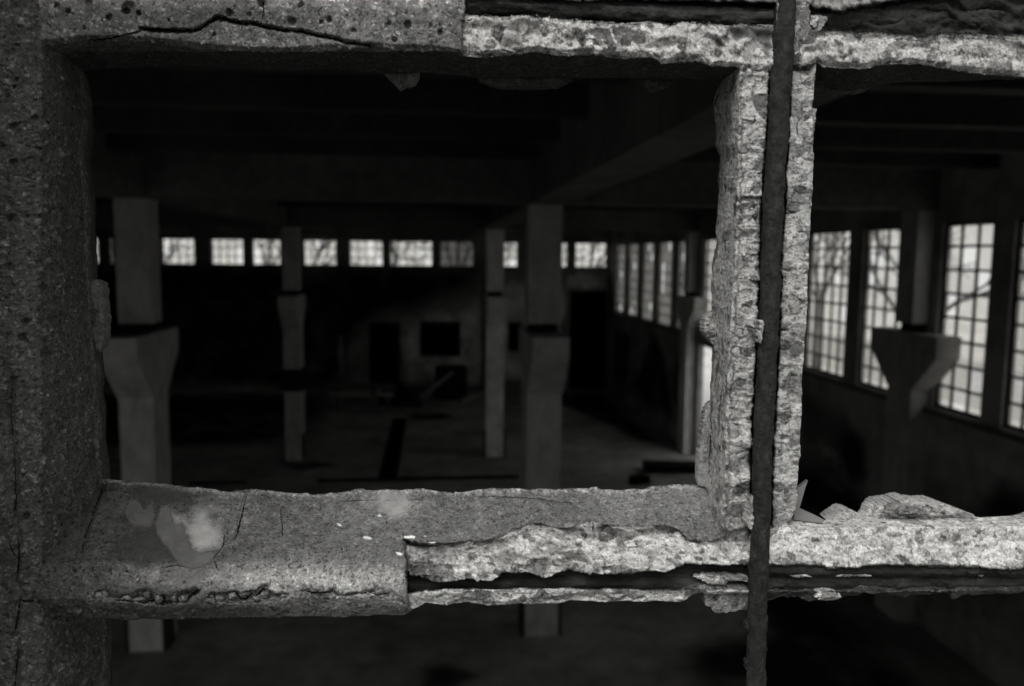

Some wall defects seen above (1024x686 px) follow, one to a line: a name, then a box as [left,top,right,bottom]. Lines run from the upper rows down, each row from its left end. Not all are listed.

crack [88,1,371,46]
spalling [403,15,773,613]
leakage [122,487,220,586]